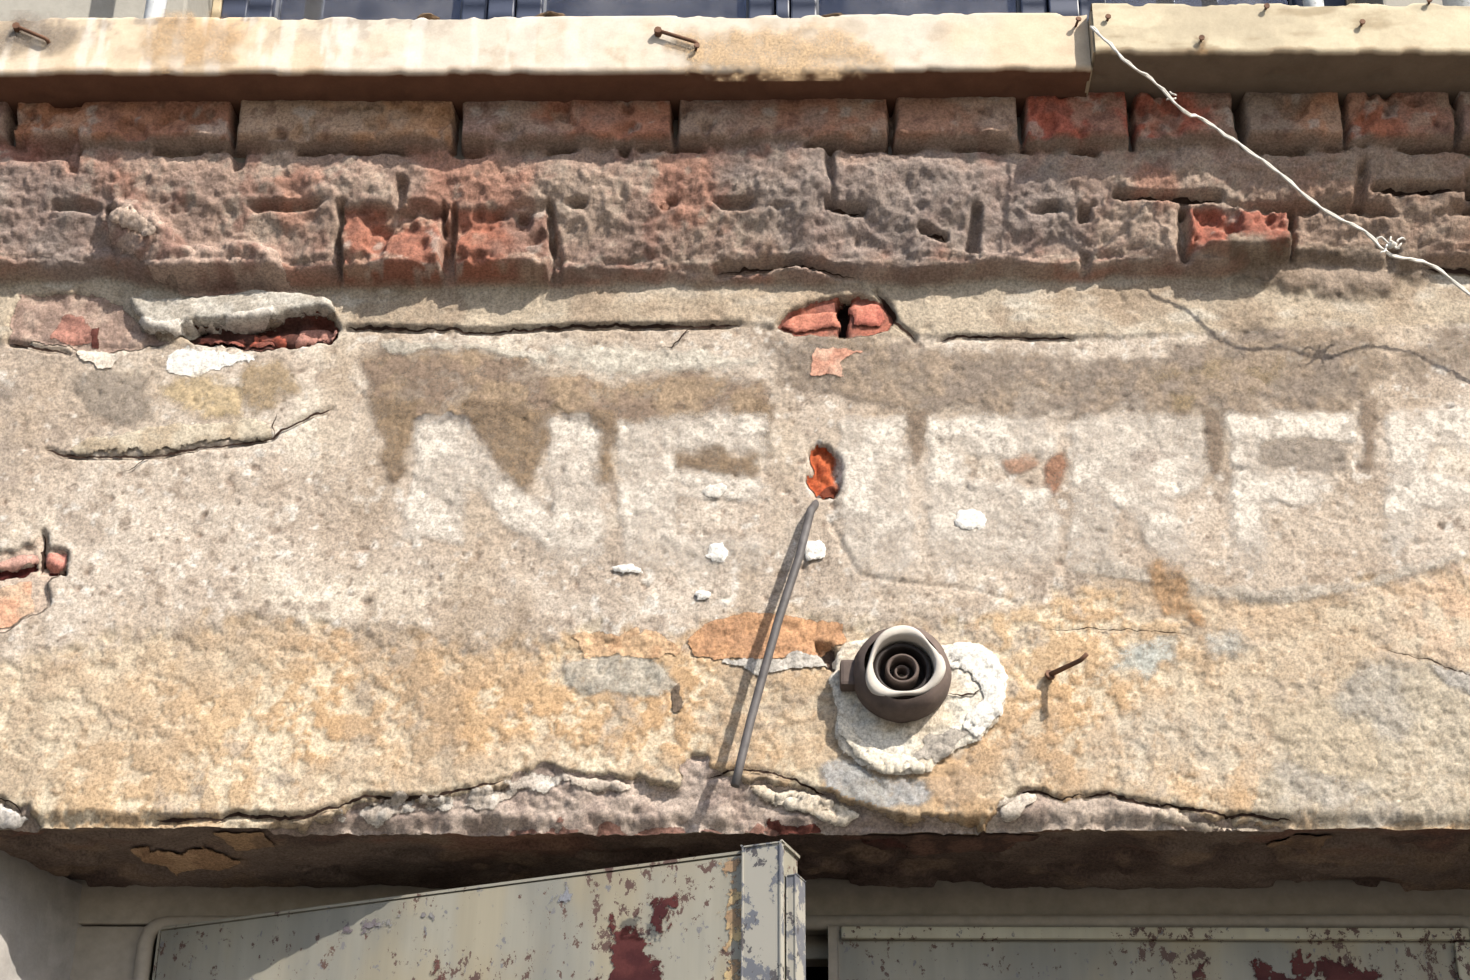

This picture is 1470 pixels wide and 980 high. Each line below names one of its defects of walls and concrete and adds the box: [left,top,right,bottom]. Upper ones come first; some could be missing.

spalling [9,289,339,369]
crack [349,323,738,348]
spalling [778,297,893,377]
crack [48,409,332,471]
spalling [806,445,840,499]
spalling [0,535,68,632]
crack [157,780,503,823]
crack [711,769,824,795]
crack [1023,790,1289,821]